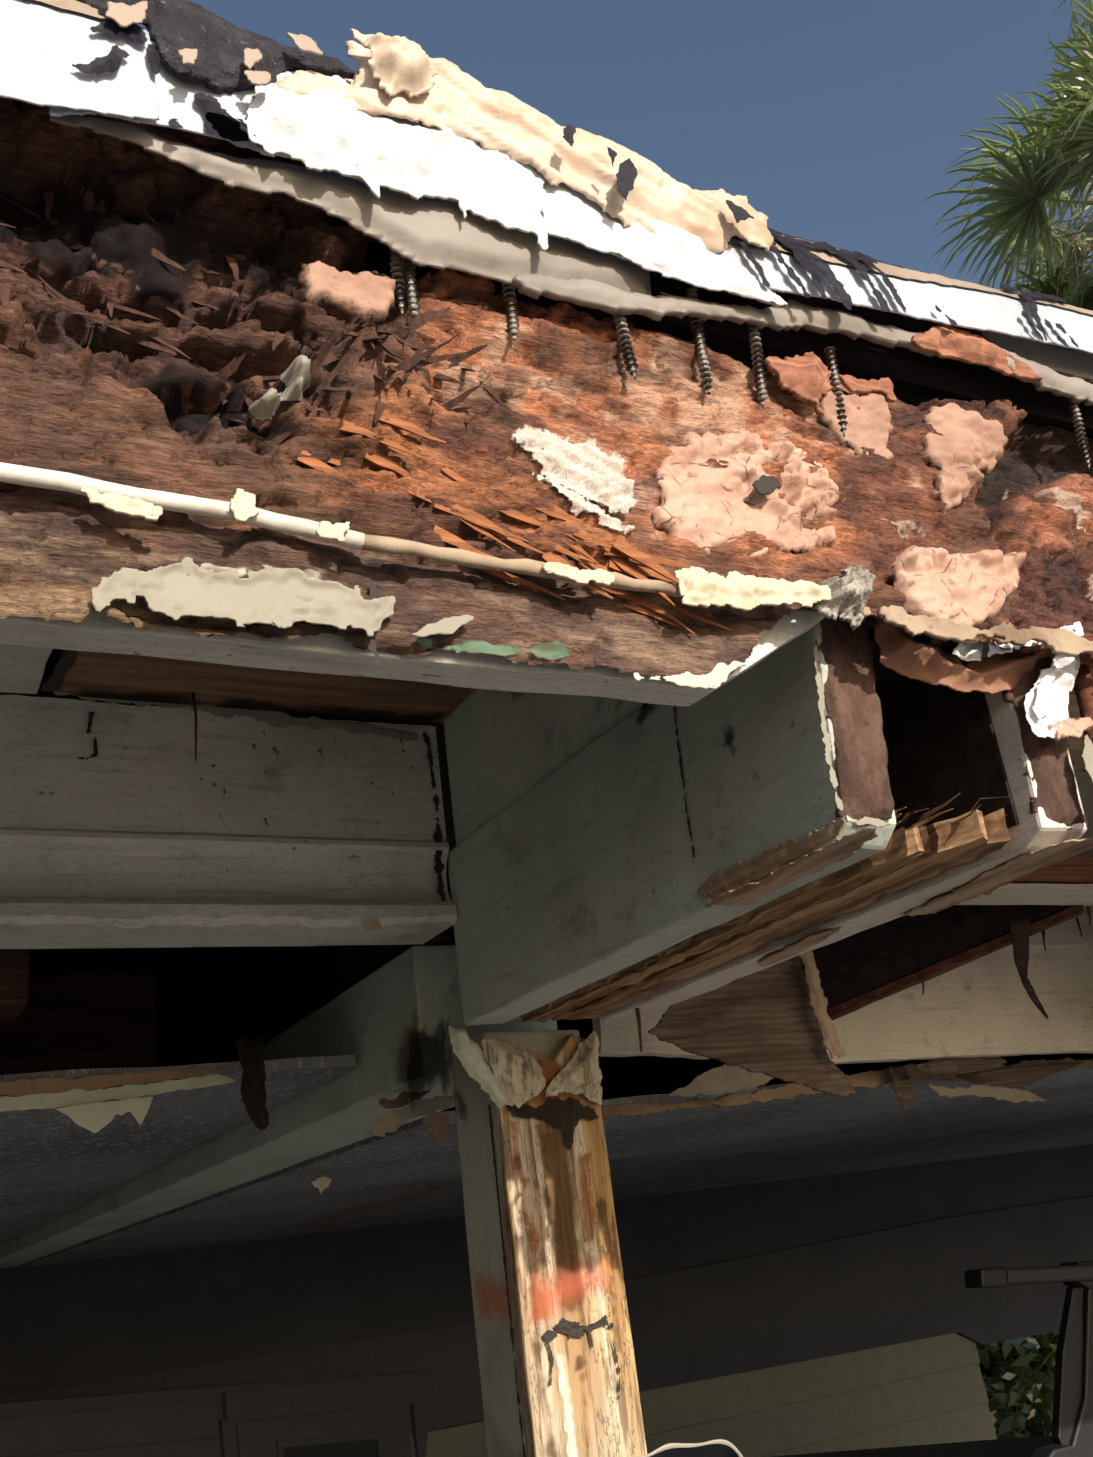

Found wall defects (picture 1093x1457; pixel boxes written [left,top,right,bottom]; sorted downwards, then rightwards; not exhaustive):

peeling [105,1,148,28]
peeling [178,48,198,65]
peeling [243,29,788,307]
spalling [0,160,304,440]
peeling [91,557,396,637]
peeling [411,614,474,638]
peeling [633,661,746,689]
spalling [845,1058,1093,1089]
spalling [601,1083,830,1118]